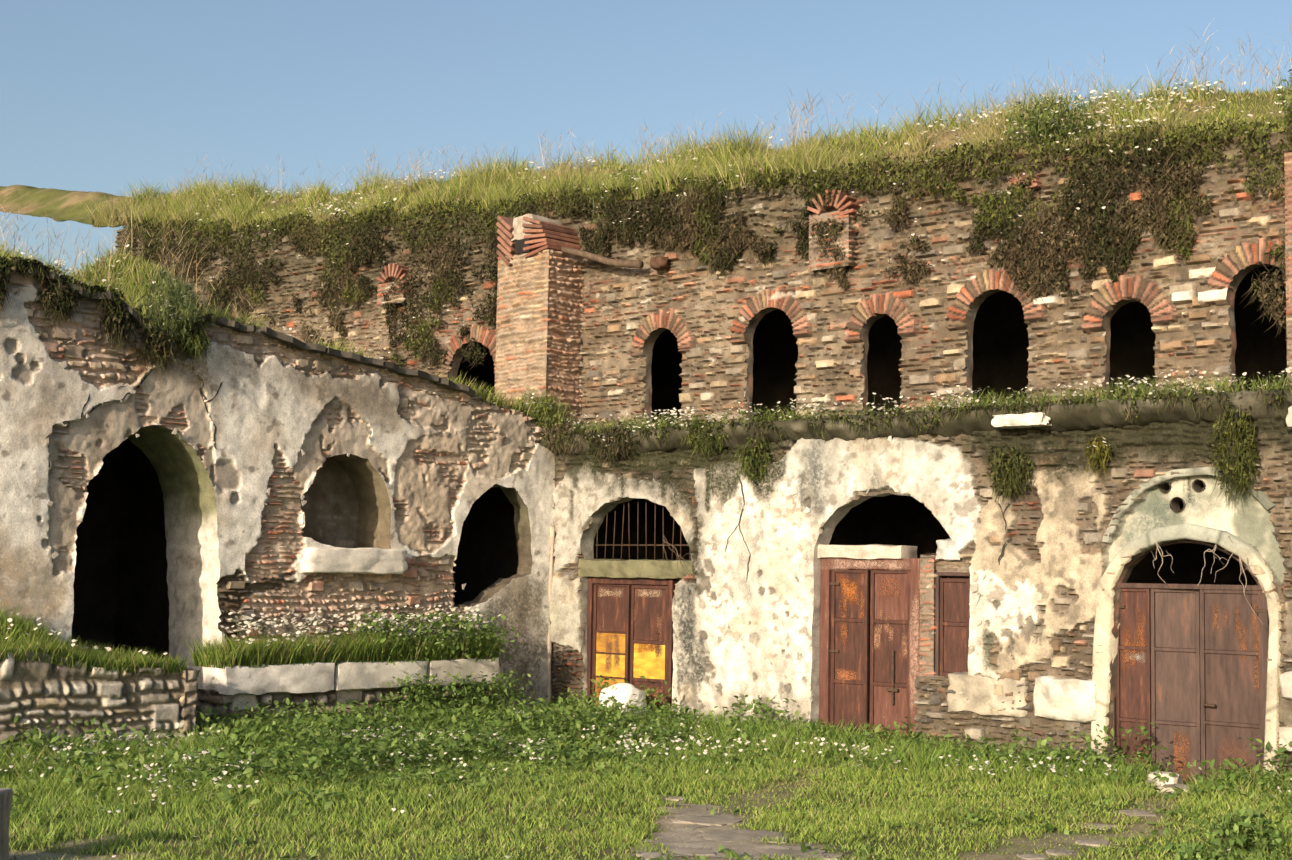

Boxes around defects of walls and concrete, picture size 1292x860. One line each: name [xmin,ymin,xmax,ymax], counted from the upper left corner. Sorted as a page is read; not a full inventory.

peeling [0,301,241,575]
spalling [245,388,537,582]
spalling [1006,486,1044,562]
hole [696,559,717,601]
hole [757,571,776,596]
spalling [969,569,1038,660]
hole [702,657,723,695]